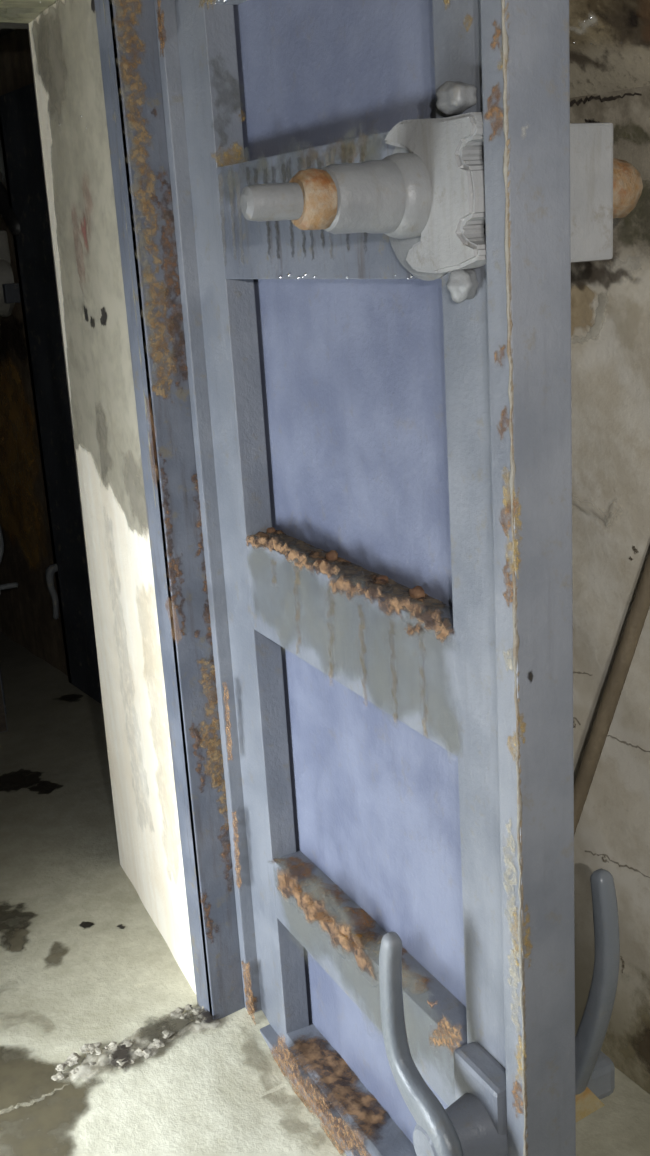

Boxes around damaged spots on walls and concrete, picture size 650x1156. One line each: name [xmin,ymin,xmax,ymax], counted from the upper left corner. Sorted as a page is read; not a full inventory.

leakage [569,53,602,67]
crack [570,93,642,123]
corrosion [115,0,188,399]
corrosion [246,527,453,642]
corrosion [500,488,521,606]
corrosion [160,455,242,890]
leakage [0,769,63,794]
leakage [0,903,37,952]
corrosion [271,857,382,977]
crack [585,851,650,878]
leakage [0,1047,96,1156]
corrosion [272,1036,386,1156]